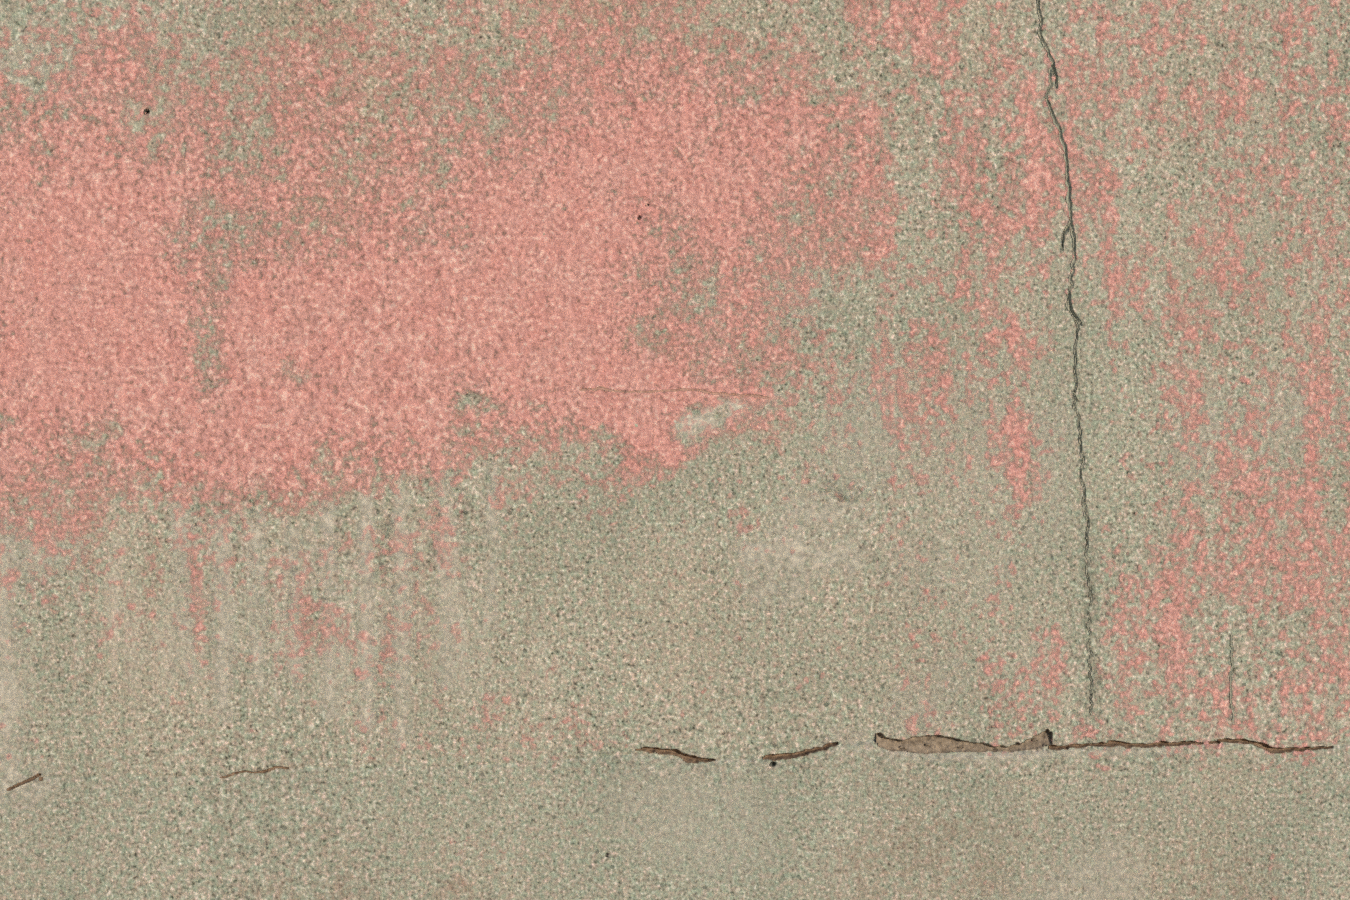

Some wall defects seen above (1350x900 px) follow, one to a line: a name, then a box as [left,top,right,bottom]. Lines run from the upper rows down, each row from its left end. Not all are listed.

crack [1037,0,1334,753]
crack [636,747,716,764]
crack [763,742,839,761]
crack [220,766,289,778]